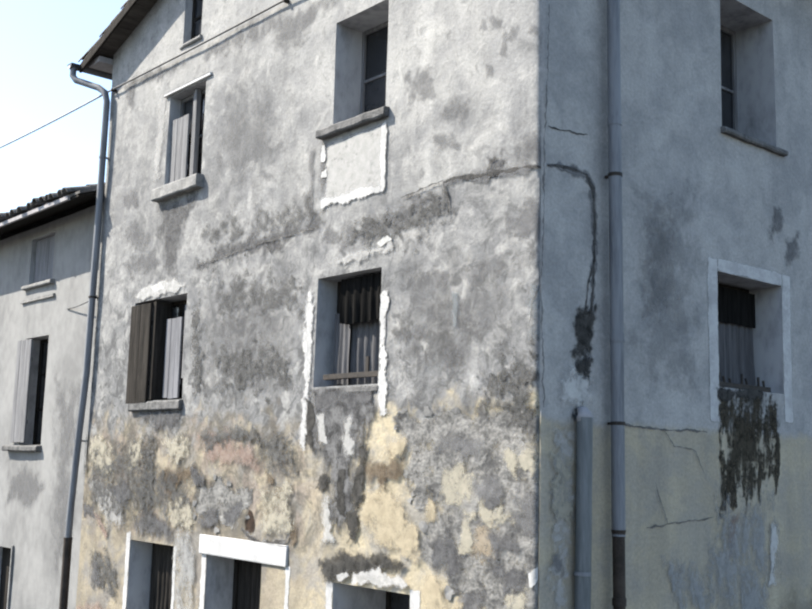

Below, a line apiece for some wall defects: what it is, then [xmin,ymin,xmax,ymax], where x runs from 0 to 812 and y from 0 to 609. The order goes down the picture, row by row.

peeling [321,121,387,209]
crack [401,7,598,407]
water stain [137,410,180,518]
water stain [305,386,404,543]
spalling [318,290,574,609]
crack [625,423,708,472]
crack [647,482,712,528]
mould [717,385,781,518]